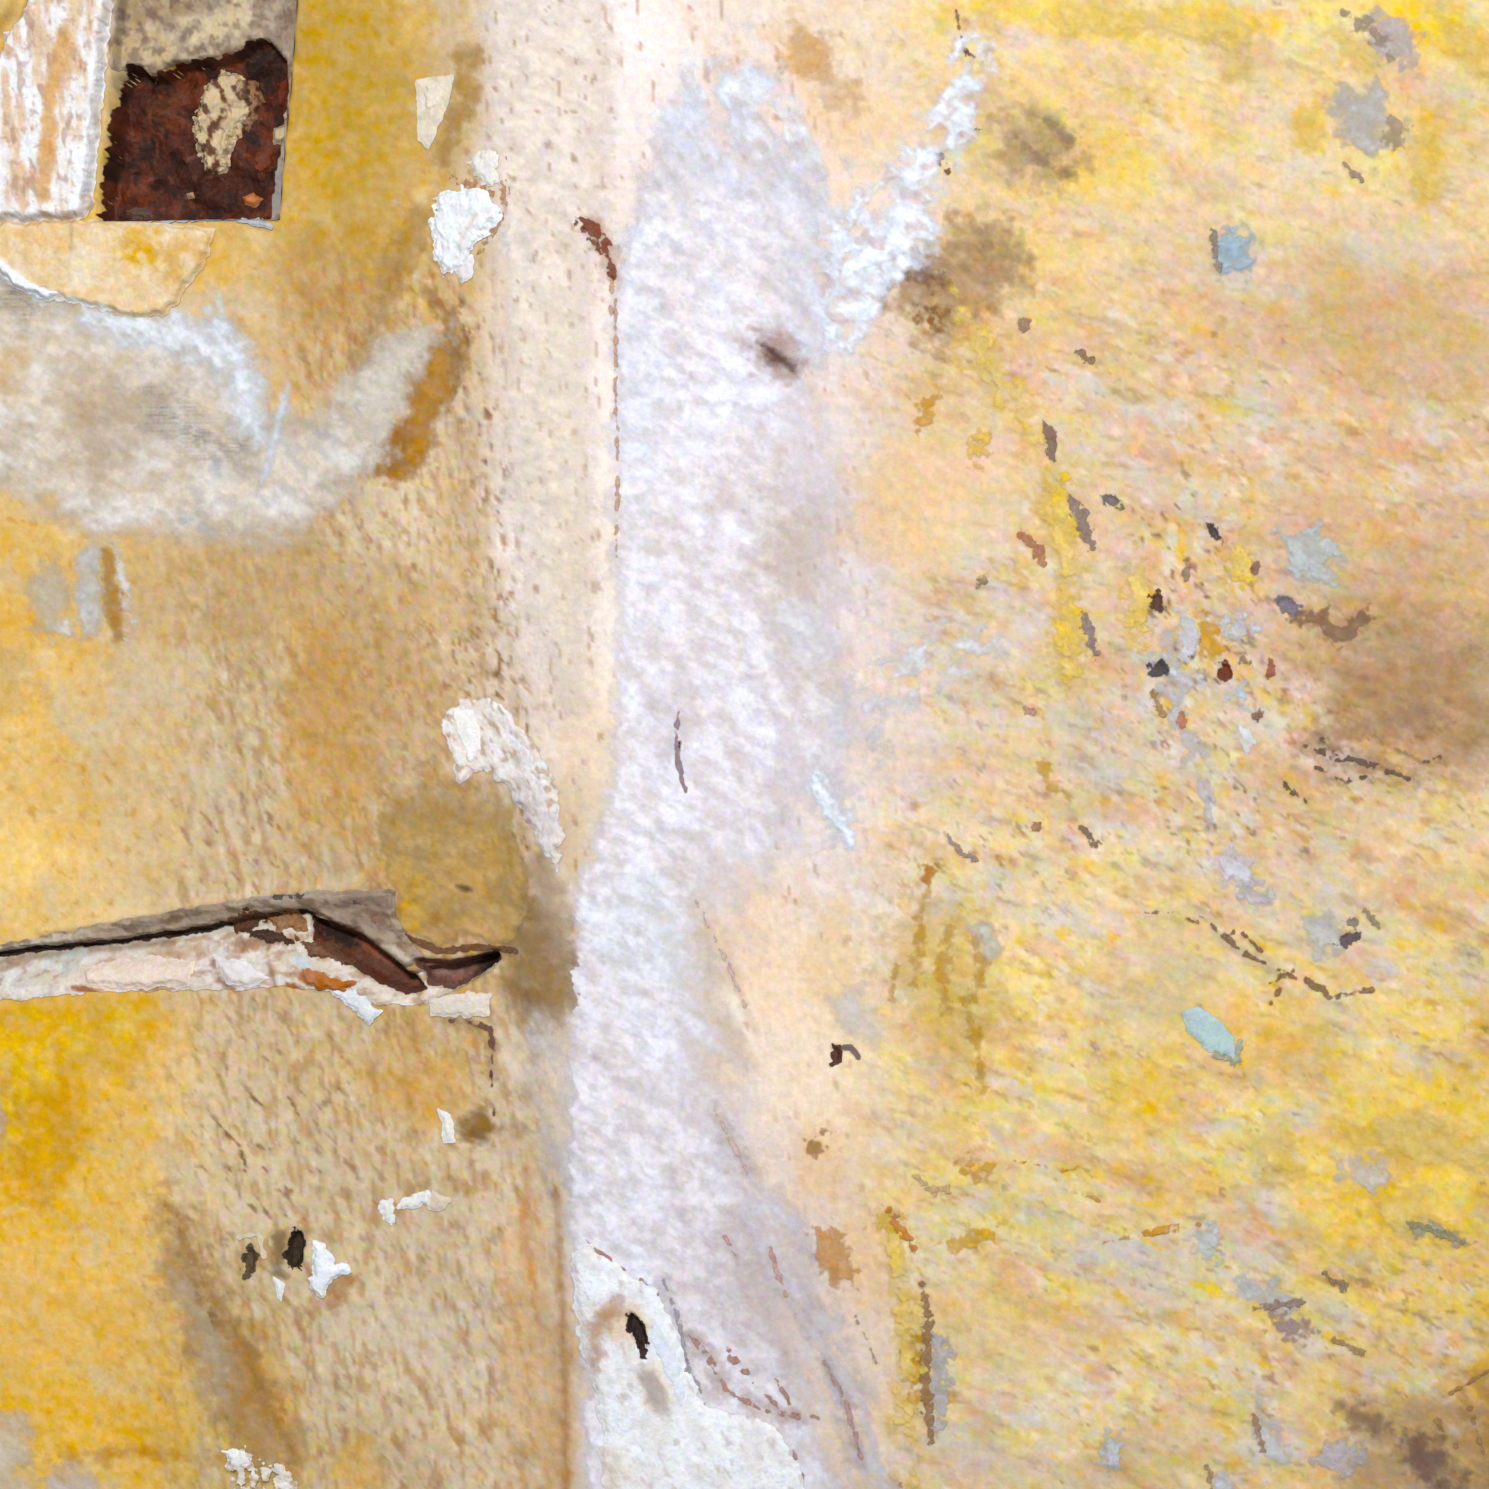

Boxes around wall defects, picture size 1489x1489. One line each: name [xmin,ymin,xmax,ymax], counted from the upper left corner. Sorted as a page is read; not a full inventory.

spalling [0,0,298,318]
spalling [428,149,512,284]
leakage [0,274,433,544]
spalling [0,698,566,1026]
leakage [505,33,1002,1489]
hole [236,1226,353,1305]
peeling [570,1246,805,1489]